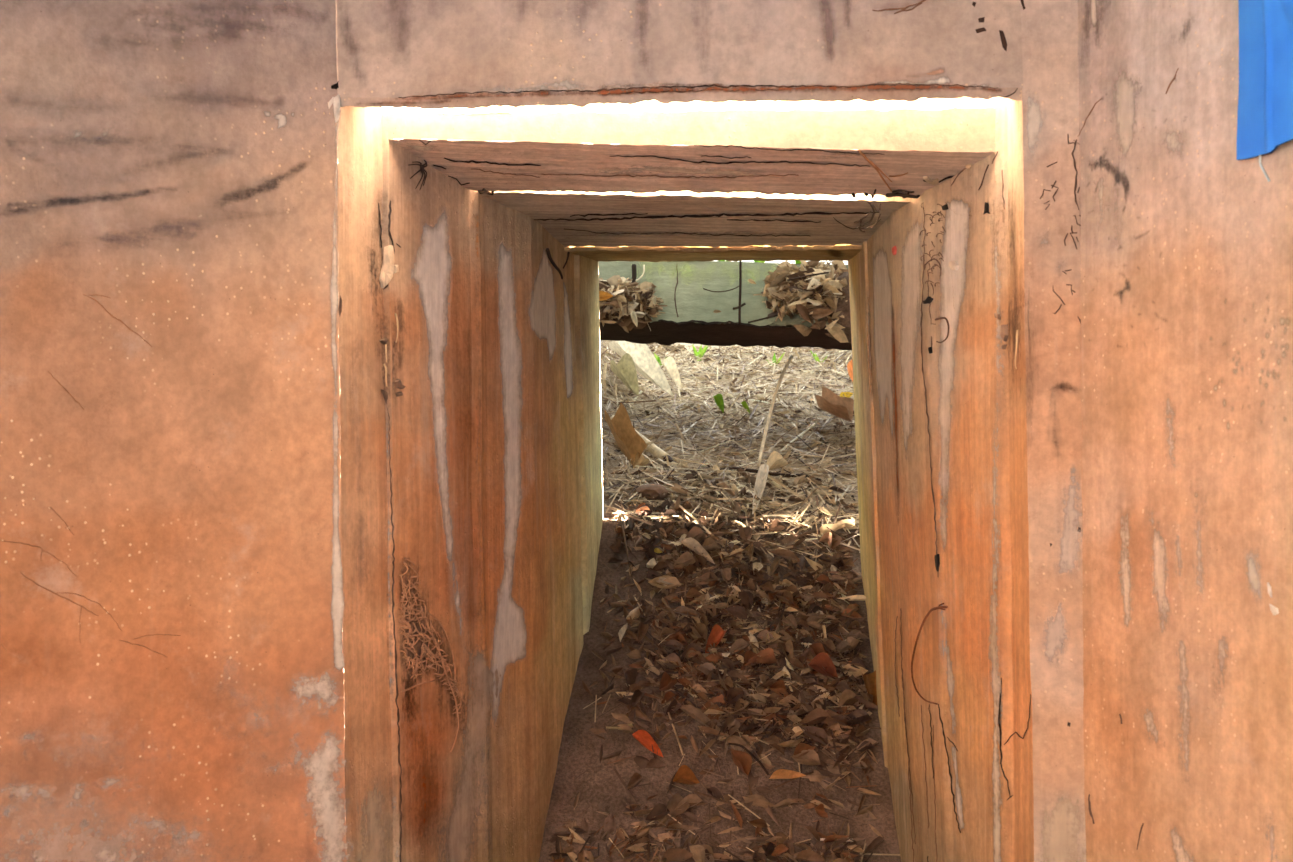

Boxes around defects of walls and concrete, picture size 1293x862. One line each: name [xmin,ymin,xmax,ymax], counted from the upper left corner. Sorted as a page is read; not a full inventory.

crack [419,140,884,186]
crack [534,212,879,328]
damp [415,217,452,553]
damp [446,245,572,862]
damp [294,676,336,708]
damp [296,734,345,862]